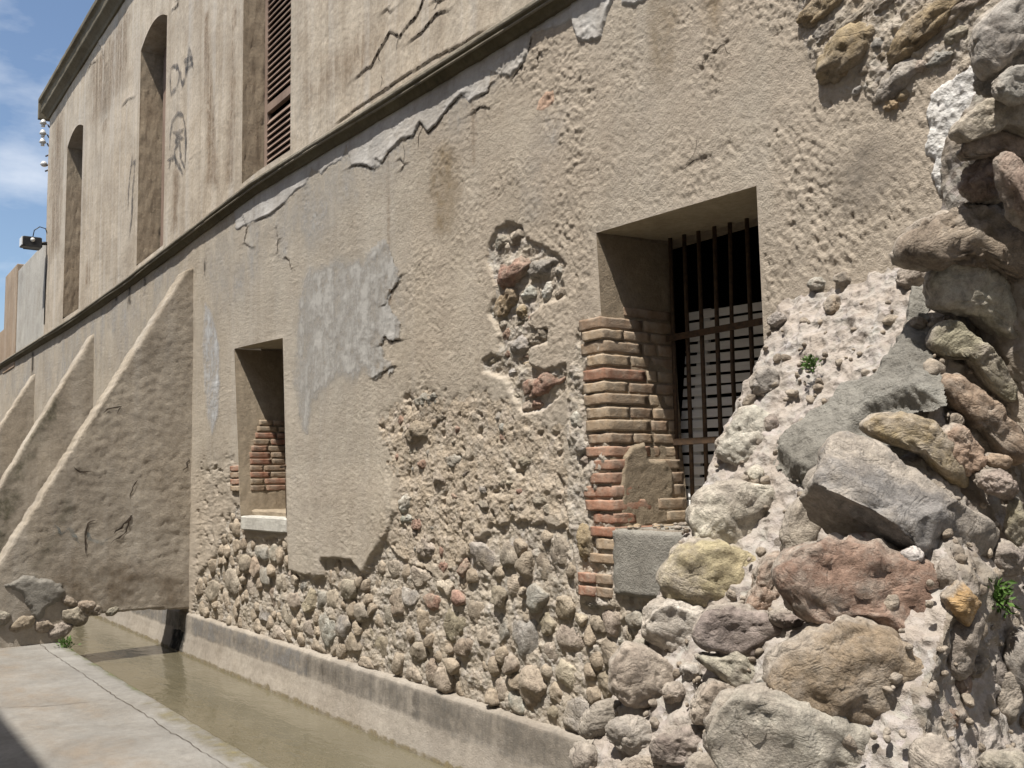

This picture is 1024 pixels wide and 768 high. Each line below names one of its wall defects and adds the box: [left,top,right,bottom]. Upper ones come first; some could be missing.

crack [343,0,479,120]
peeling [234,0,646,230]
crack [85,480,138,552]
flaking render [192,222,649,733]